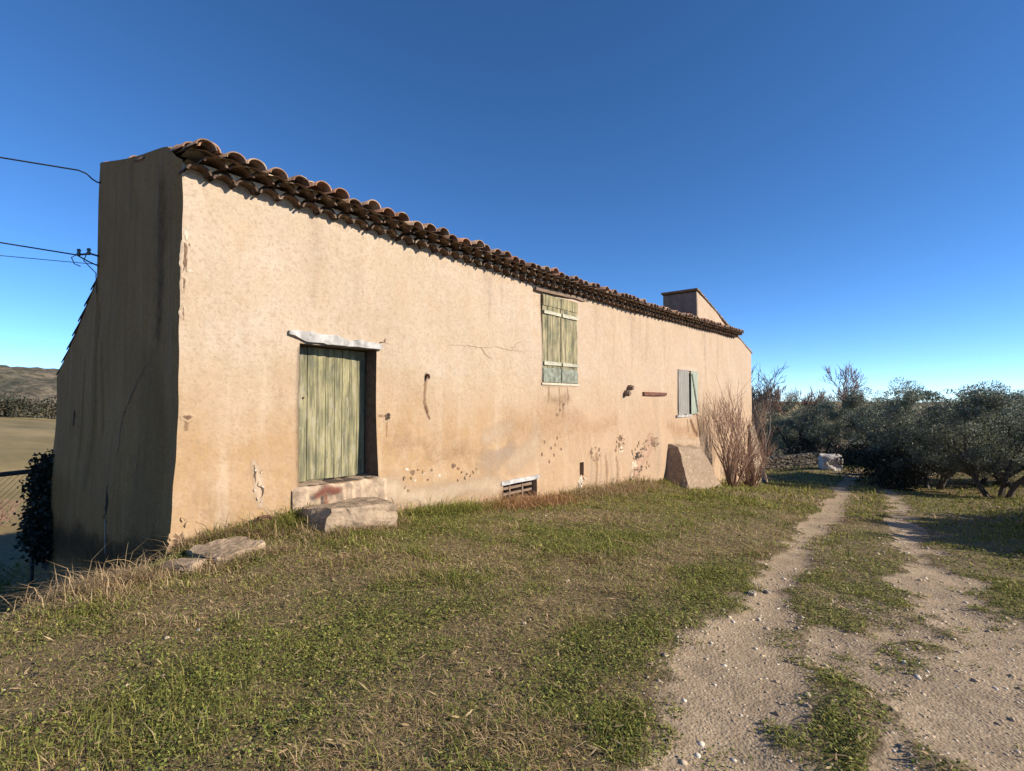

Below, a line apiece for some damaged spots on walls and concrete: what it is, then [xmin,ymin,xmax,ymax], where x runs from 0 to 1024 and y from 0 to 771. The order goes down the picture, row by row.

peeling [252,460,264,507]
peeling [387,463,501,506]
spalling [578,433,660,488]